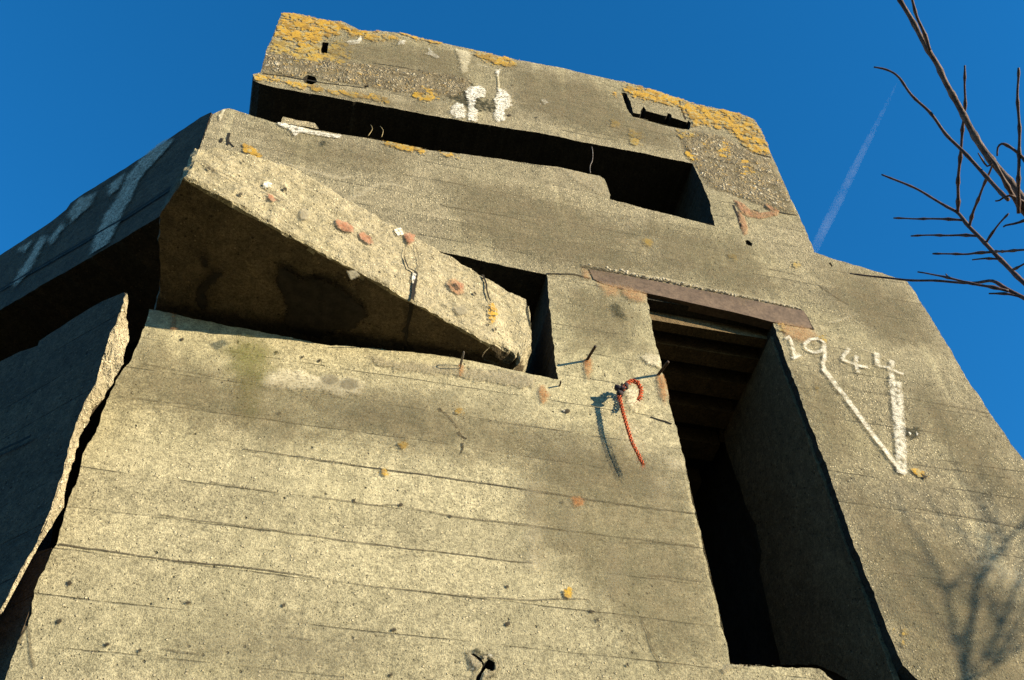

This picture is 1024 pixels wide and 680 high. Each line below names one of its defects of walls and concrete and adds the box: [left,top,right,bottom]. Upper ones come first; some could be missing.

crack [5,293,592,605]
spalling [467,648,500,680]